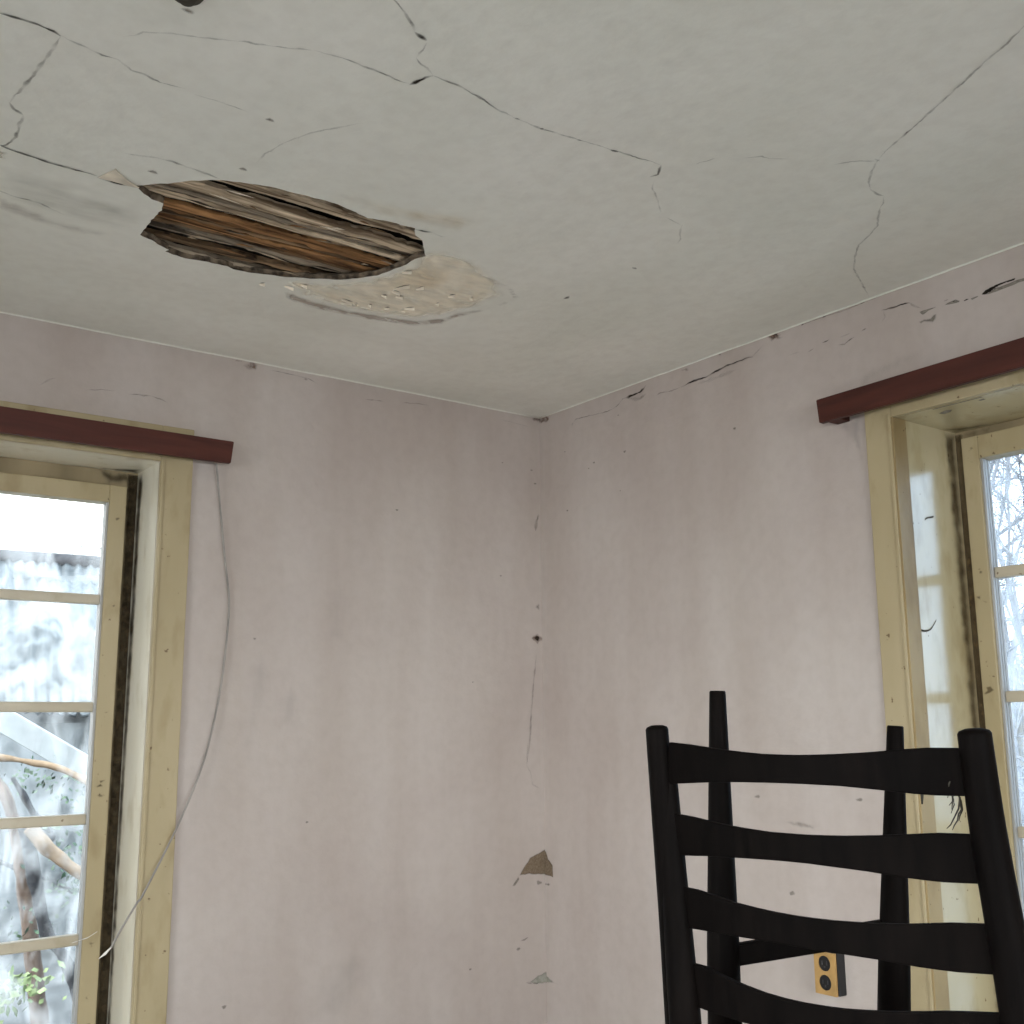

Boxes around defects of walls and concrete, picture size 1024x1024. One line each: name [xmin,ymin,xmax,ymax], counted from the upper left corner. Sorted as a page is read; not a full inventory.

crack [3,14,54,32]
crack [412,77,492,106]
crack [0,110,86,173]
spalling [140,230,425,313]
crack [686,358,745,385]
spalling [514,850,553,885]